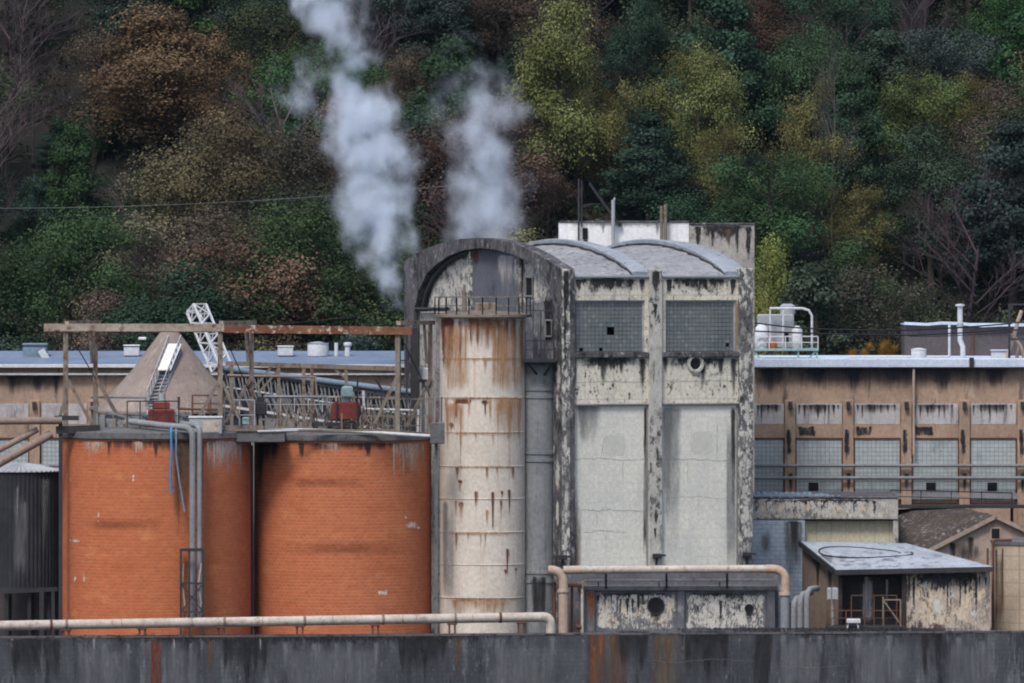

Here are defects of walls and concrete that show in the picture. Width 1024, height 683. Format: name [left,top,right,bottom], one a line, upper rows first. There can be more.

water stain [695,225,752,253]
peeling [431,258,468,312]
corrosion [441,318,523,384]
water stain [761,368,1005,389]
corrosion [445,397,522,444]
water stain [902,404,953,453]
water stain [84,440,277,507]
corrosion [455,458,514,546]
peeling [743,498,895,538]
peeling [597,594,765,629]
peeling [910,577,988,626]
corrosion [151,639,161,683]